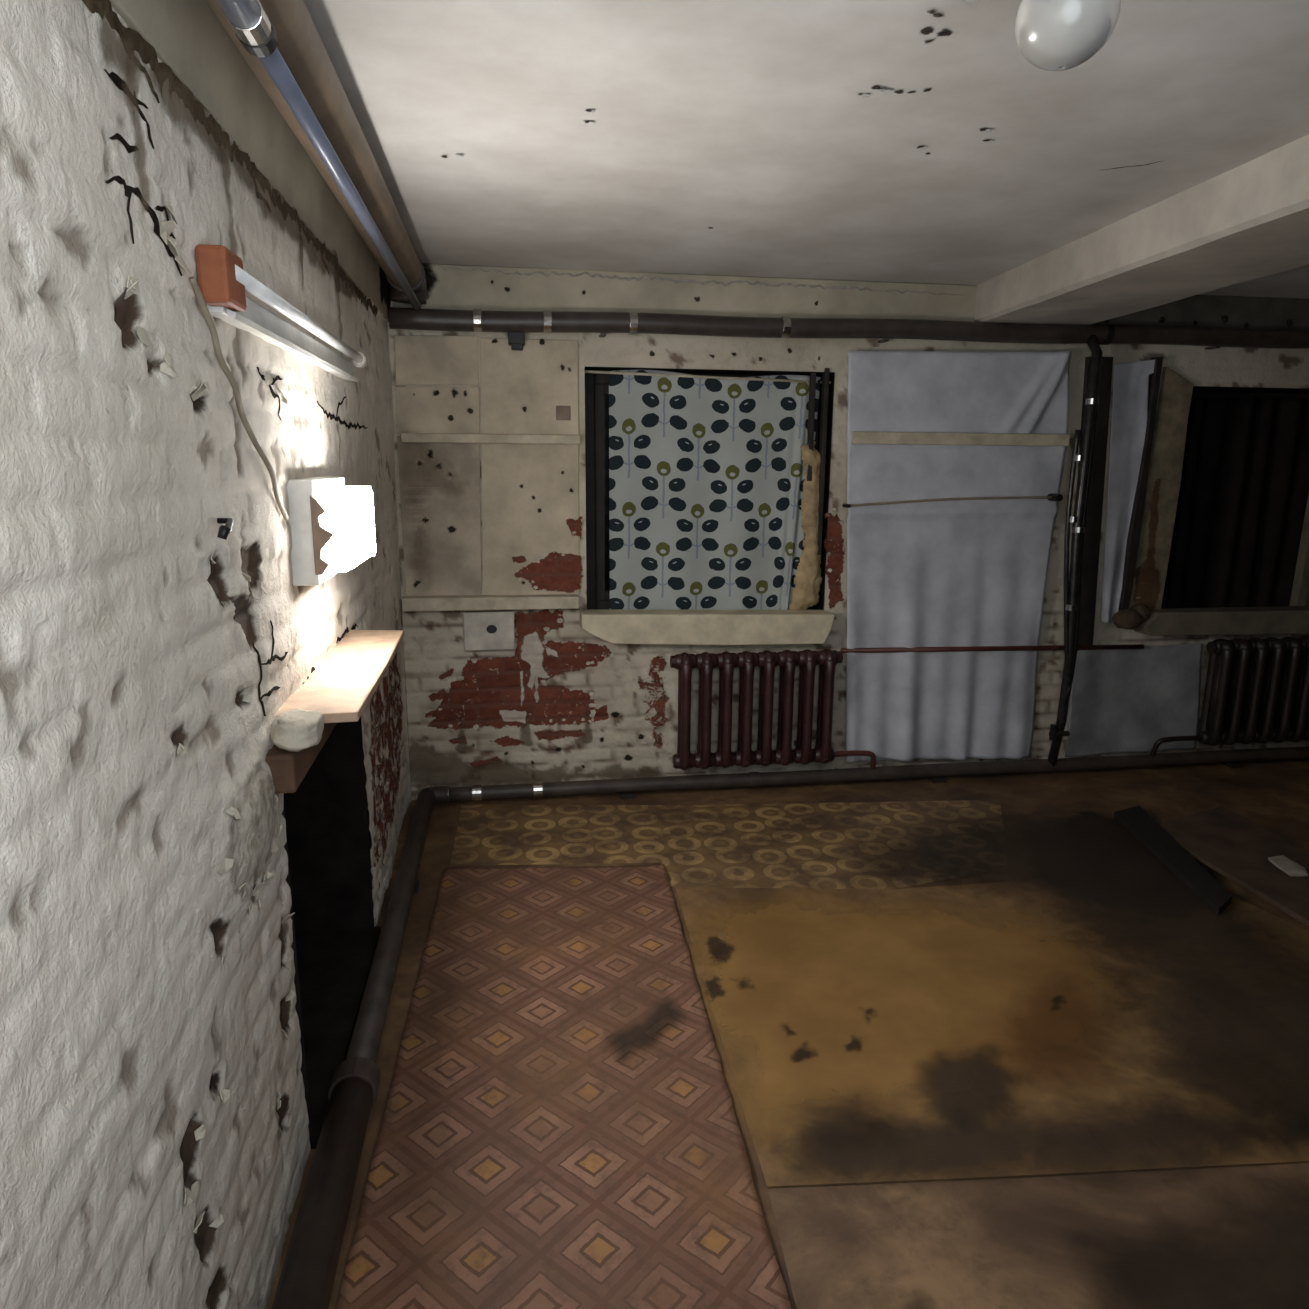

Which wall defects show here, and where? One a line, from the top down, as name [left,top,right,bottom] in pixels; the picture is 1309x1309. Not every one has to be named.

peeling [921,9,952,44]
peeling [858,85,931,98]
crack [82,0,378,317]
spalling [114,276,178,377]
crack [256,367,367,430]
peeling [512,517,585,593]
peeling [824,506,846,609]
crack [253,621,315,716]
peeling [425,609,619,769]
peeling [632,650,671,754]
peeling [365,653,406,886]
spalling [180,1113,232,1309]